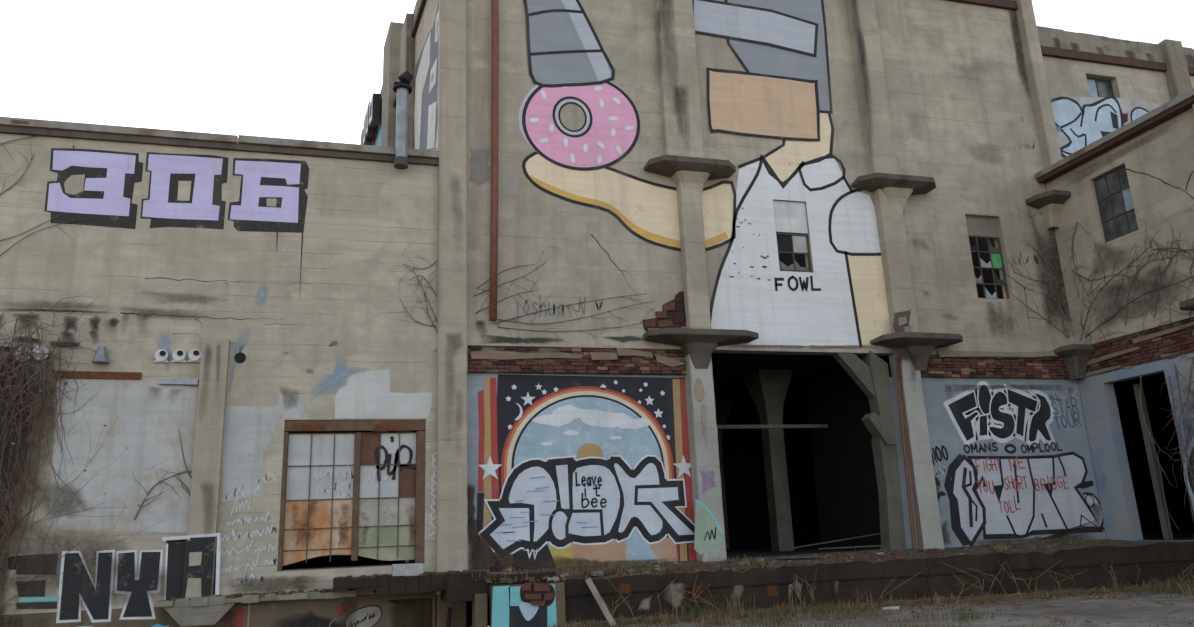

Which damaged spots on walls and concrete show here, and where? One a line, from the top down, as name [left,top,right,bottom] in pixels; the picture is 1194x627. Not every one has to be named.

spalling [643,291,687,331]
leakage [15,320,79,347]